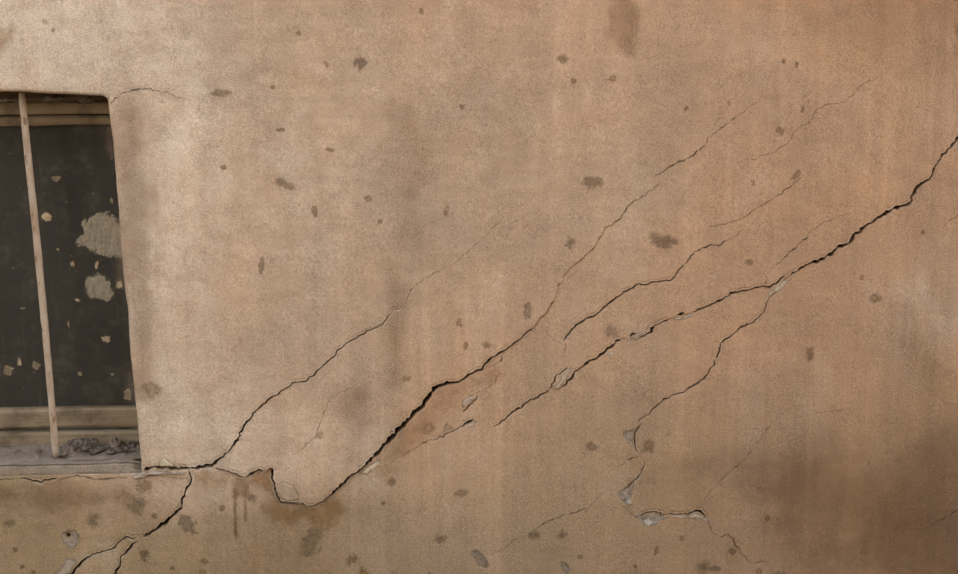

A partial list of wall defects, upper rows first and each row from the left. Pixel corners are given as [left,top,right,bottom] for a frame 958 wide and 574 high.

crack [108,87,189,105]
crack [655,102,758,176]
crack [737,75,881,163]
crack [0,135,958,574]